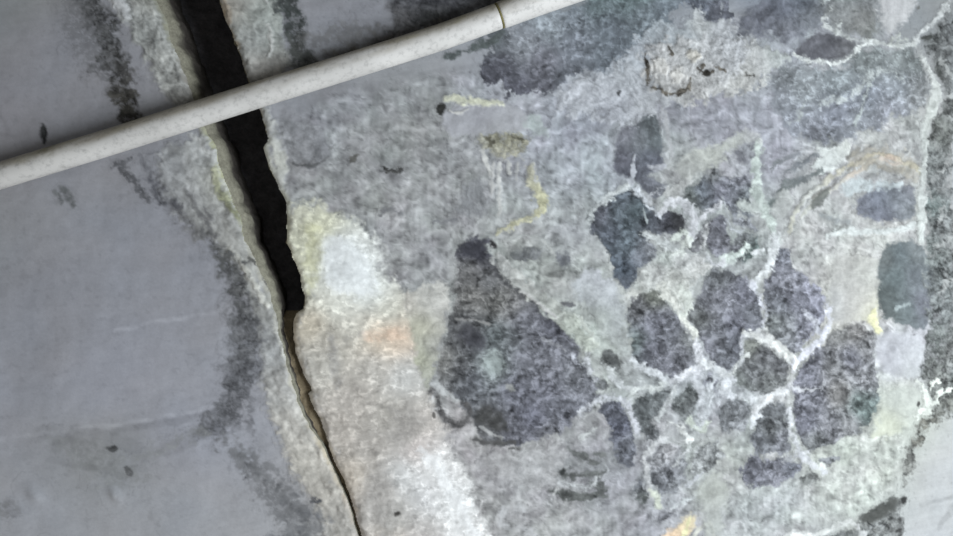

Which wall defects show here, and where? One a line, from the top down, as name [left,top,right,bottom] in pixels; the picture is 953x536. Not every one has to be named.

damp [44,0,148,127]
crack [156,0,250,101]
spalling [260,105,291,196]
peeling [435,92,553,142]
spalling [634,27,759,112]
damp [36,146,337,536]
spalling [152,130,354,536]
crack [205,109,362,536]
damp [267,0,953,536]